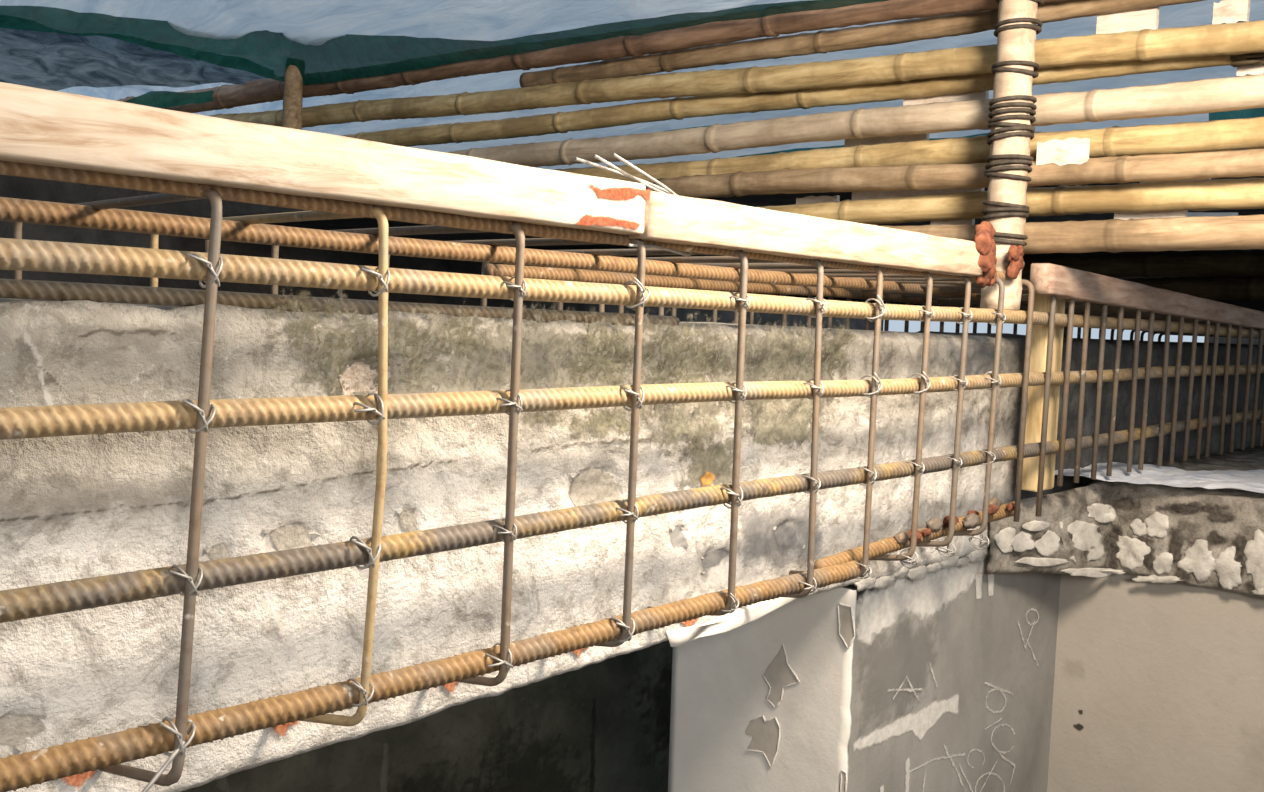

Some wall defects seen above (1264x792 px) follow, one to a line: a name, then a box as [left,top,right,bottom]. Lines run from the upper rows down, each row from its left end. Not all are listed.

crack [0,510,103,521]
crack [142,460,457,507]
spalling [854,498,1264,595]
flaking render [838,603,855,648]
water stain [641,667,672,752]
flaking render [745,644,800,767]